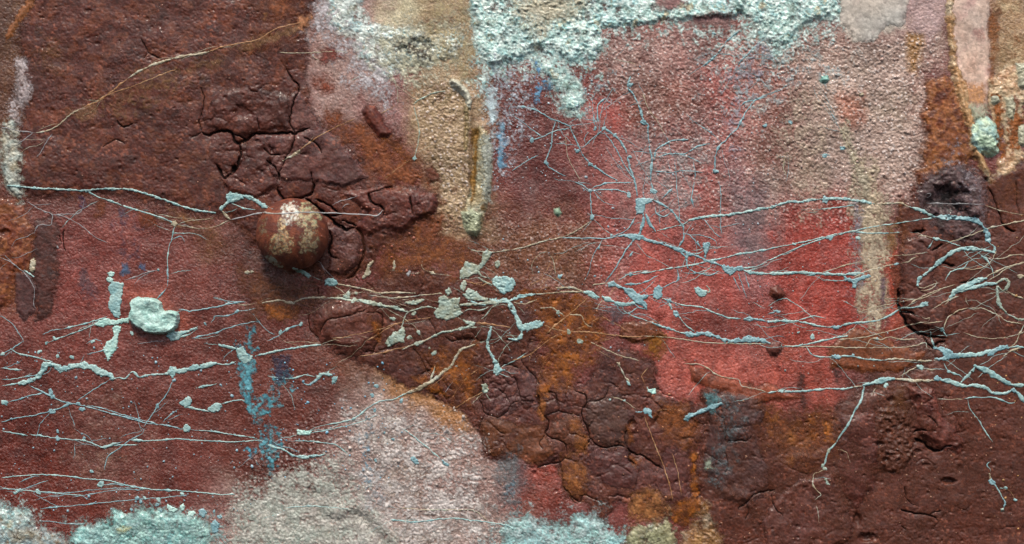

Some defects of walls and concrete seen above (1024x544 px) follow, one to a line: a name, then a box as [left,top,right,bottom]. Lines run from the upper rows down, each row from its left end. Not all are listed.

crack [190,68,366,280]
leakage [301,0,896,330]
crack [308,293,384,354]
crack [428,318,478,342]
rust [367,276,607,421]
leakage [0,355,723,544]
crack [413,348,663,505]
rust [563,420,589,494]
rust [629,402,701,526]